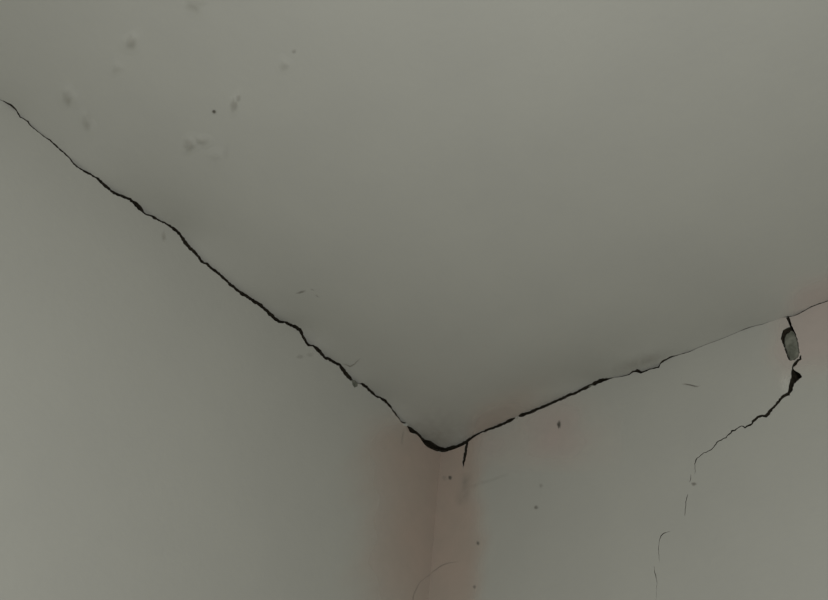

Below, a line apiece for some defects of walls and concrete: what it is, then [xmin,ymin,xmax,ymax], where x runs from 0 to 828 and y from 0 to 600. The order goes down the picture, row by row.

crack [1,100,827,509]